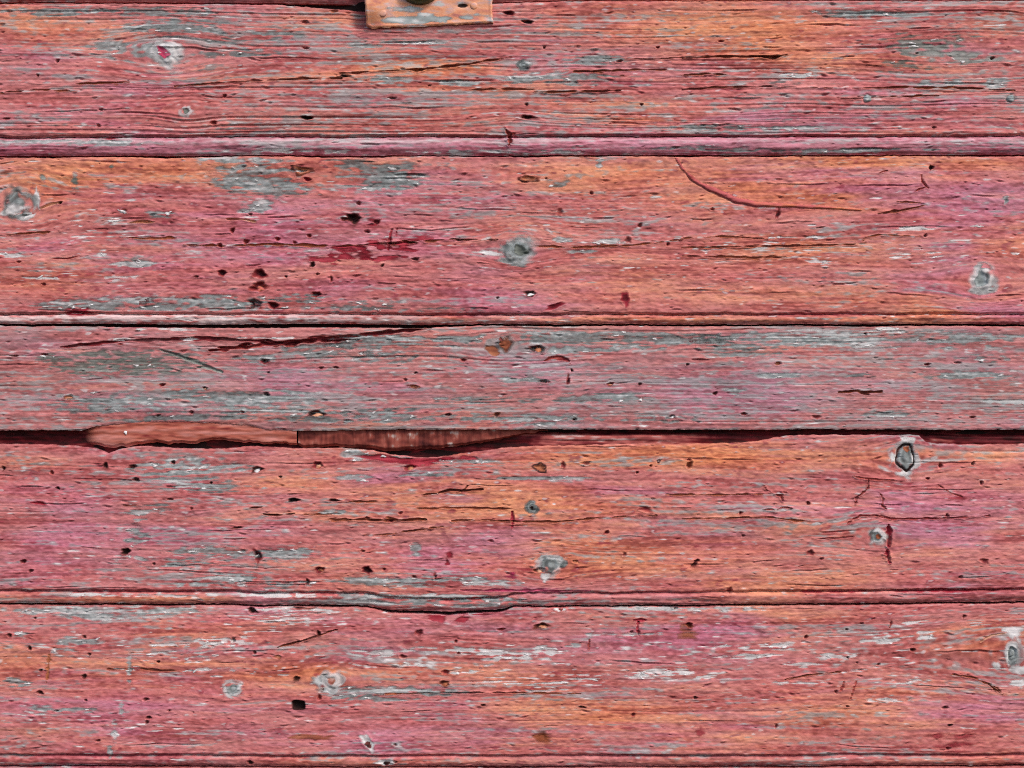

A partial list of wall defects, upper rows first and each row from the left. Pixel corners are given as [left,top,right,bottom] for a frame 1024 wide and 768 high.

peeling [199,148,470,213]
crack [538,174,929,260]
peeling [36,329,190,376]
peeling [234,335,484,363]
peeling [520,327,1024,379]
peeling [47,389,650,426]
spalling [838,374,883,395]
peeling [860,621,933,644]
peeling [118,636,253,682]
peeling [332,686,468,701]
peeling [349,633,661,692]
peeling [630,669,716,679]